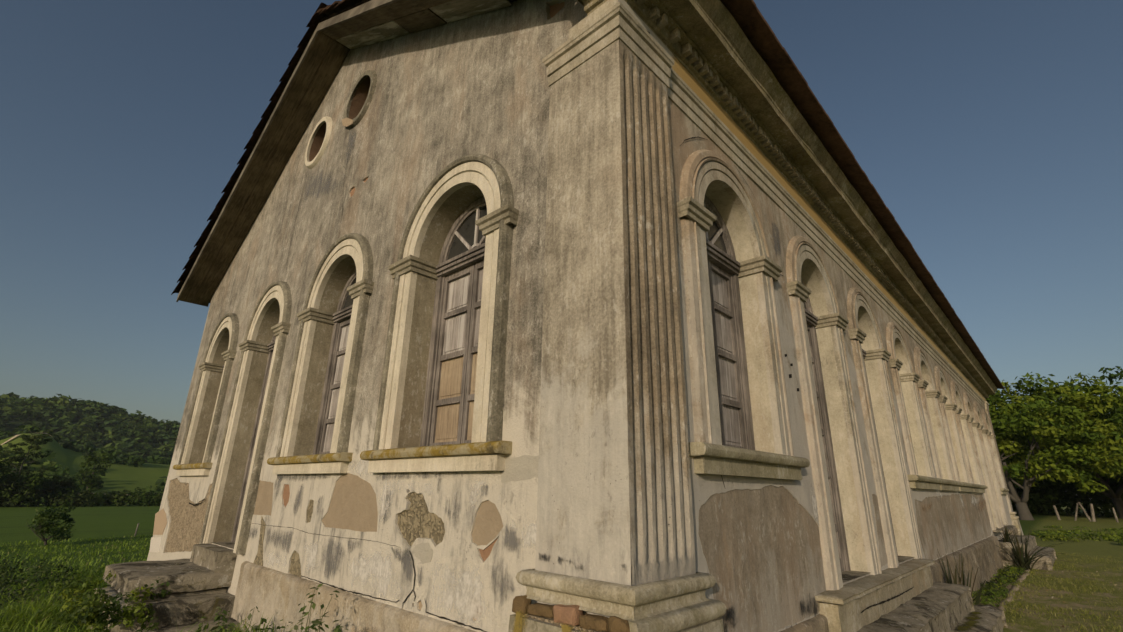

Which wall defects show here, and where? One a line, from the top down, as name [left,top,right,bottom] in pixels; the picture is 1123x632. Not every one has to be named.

spalling [149,478,212,553]
flaking render [305,473,378,532]
spalling [395,489,445,548]
flaking render [471,500,503,563]
damp [504,521,582,569]
flaking render [698,485,826,632]
damp [435,566,514,623]
flaking render [512,595,630,632]